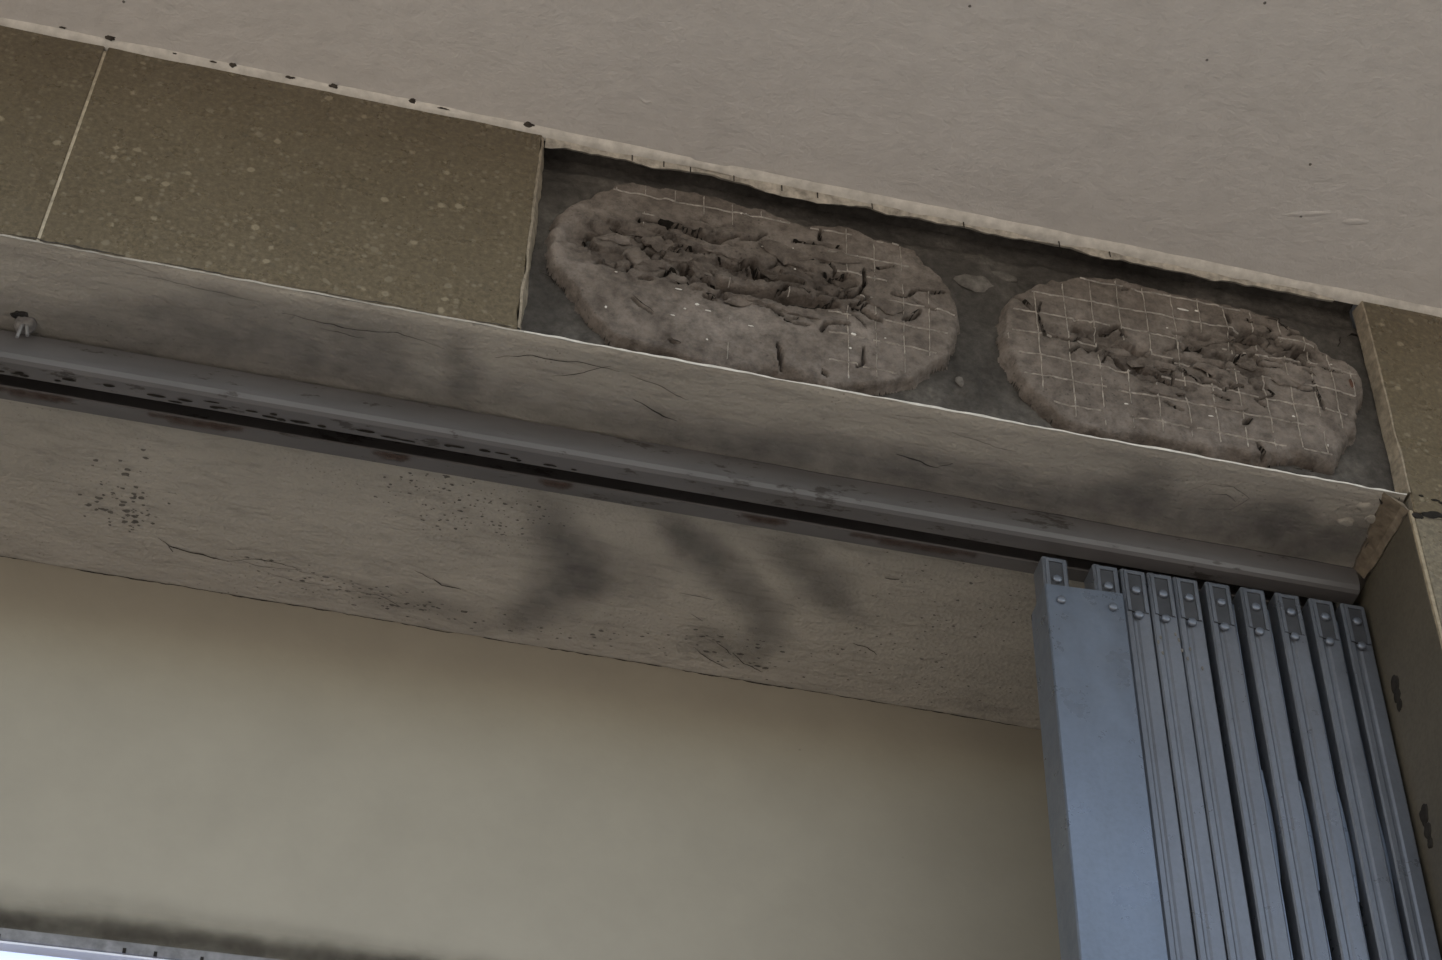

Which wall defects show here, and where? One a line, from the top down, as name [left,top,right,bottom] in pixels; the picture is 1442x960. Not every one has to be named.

peeling [518,121,1411,578]